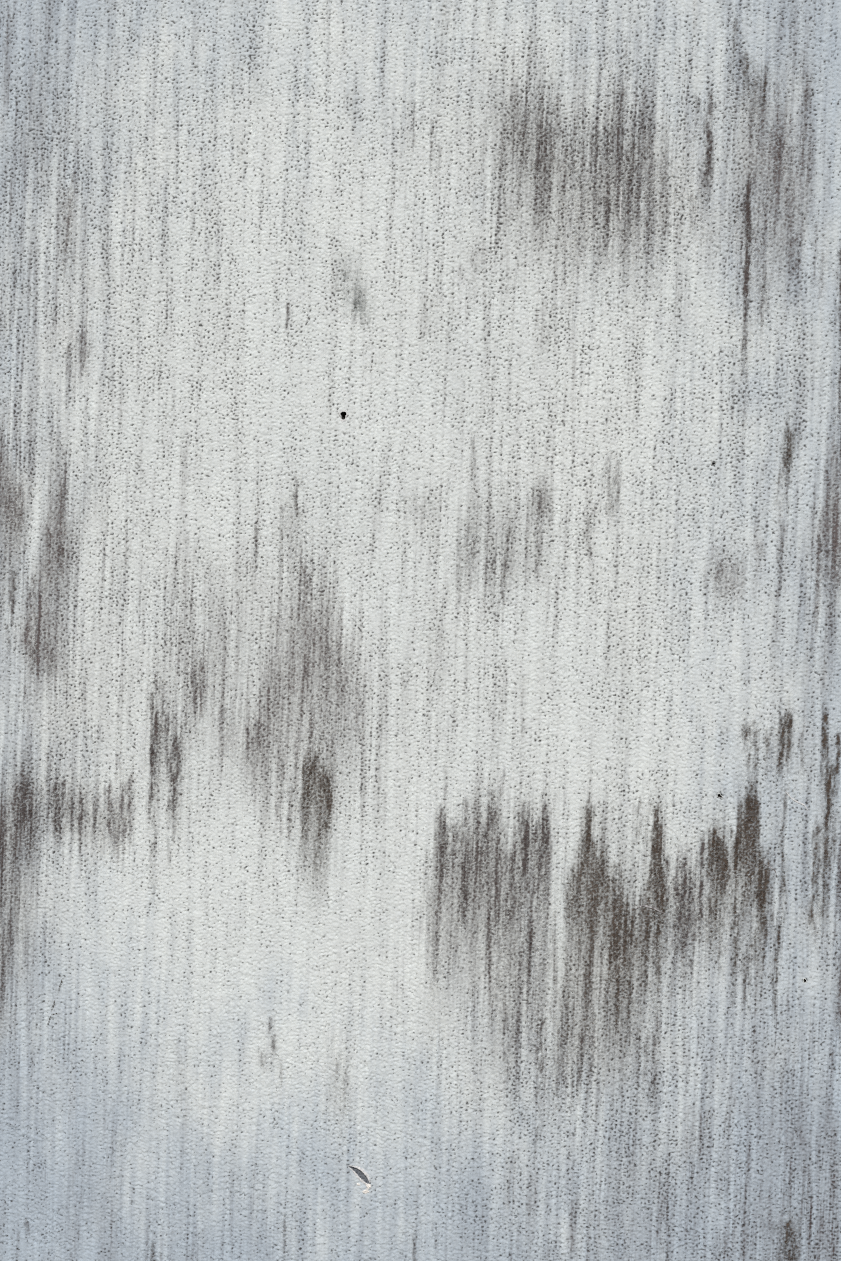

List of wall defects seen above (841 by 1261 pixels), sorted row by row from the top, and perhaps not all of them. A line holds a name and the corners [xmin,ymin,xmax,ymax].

water stain [512,96,566,208]
water stain [590,124,664,228]
water stain [743,76,813,322]
water stain [816,446,841,588]
water stain [0,768,130,997]
water stain [151,702,182,817]
water stain [248,575,347,751]
water stain [302,756,332,848]
water stain [434,798,551,1013]
water stain [561,785,783,1057]
water stain [745,715,792,766]
water stain [809,715,841,920]